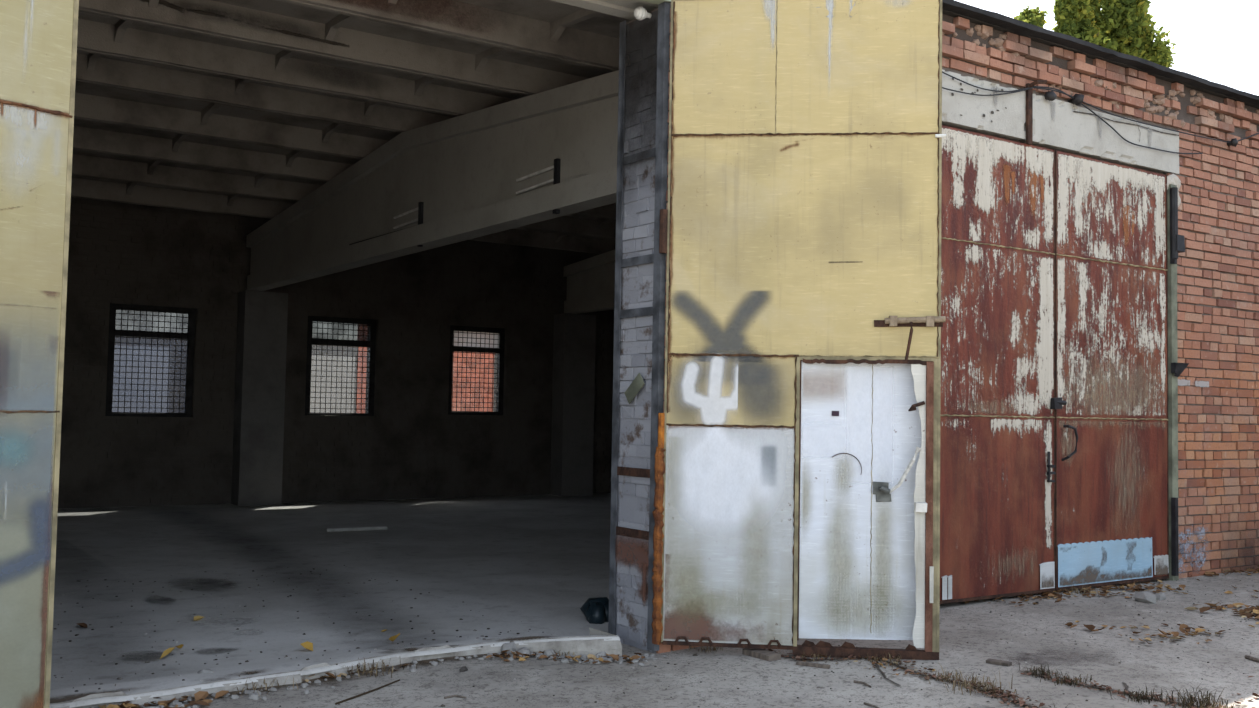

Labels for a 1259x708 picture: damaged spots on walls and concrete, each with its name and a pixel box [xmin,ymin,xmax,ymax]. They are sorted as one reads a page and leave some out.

spalling [942,25,1020,57]
corrosion [0,99,69,126]
corrosion [671,80,798,193]
spalling [1049,75,1247,127]
corrosion [1030,169,1044,212]
peeling [941,128,1209,548]
corrosion [668,314,729,428]
corrosion [664,607,740,641]